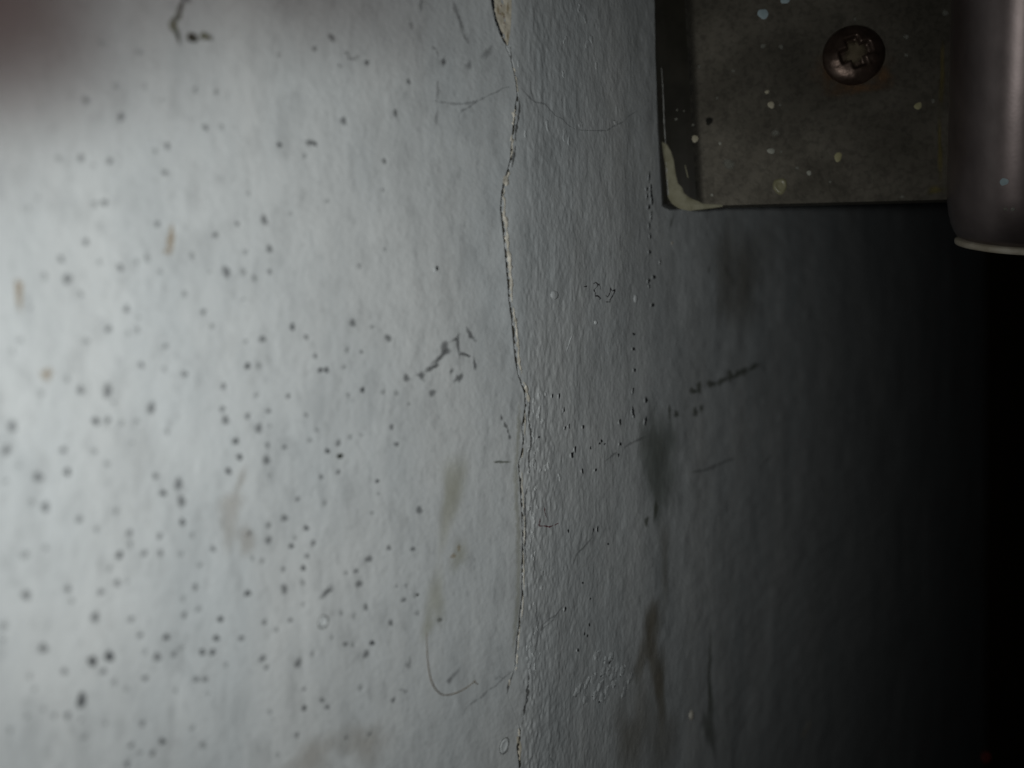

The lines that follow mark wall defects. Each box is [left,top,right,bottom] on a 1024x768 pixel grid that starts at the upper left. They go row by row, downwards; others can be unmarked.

damp [418,331,476,378]
crack [500,47,532,768]